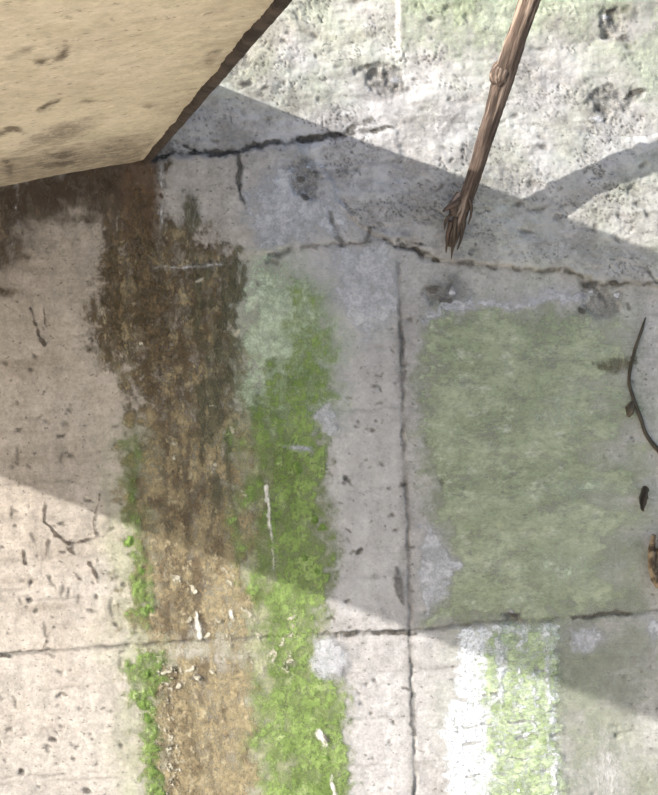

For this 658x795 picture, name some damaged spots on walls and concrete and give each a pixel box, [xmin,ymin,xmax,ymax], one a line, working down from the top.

crack [152,117,390,201]
crack [329,212,439,262]
crack [538,269,625,302]
water stain [592,358,637,373]
water stain [0,139,275,795]
water stain [268,615,295,673]
efflorescence [439,623,563,795]